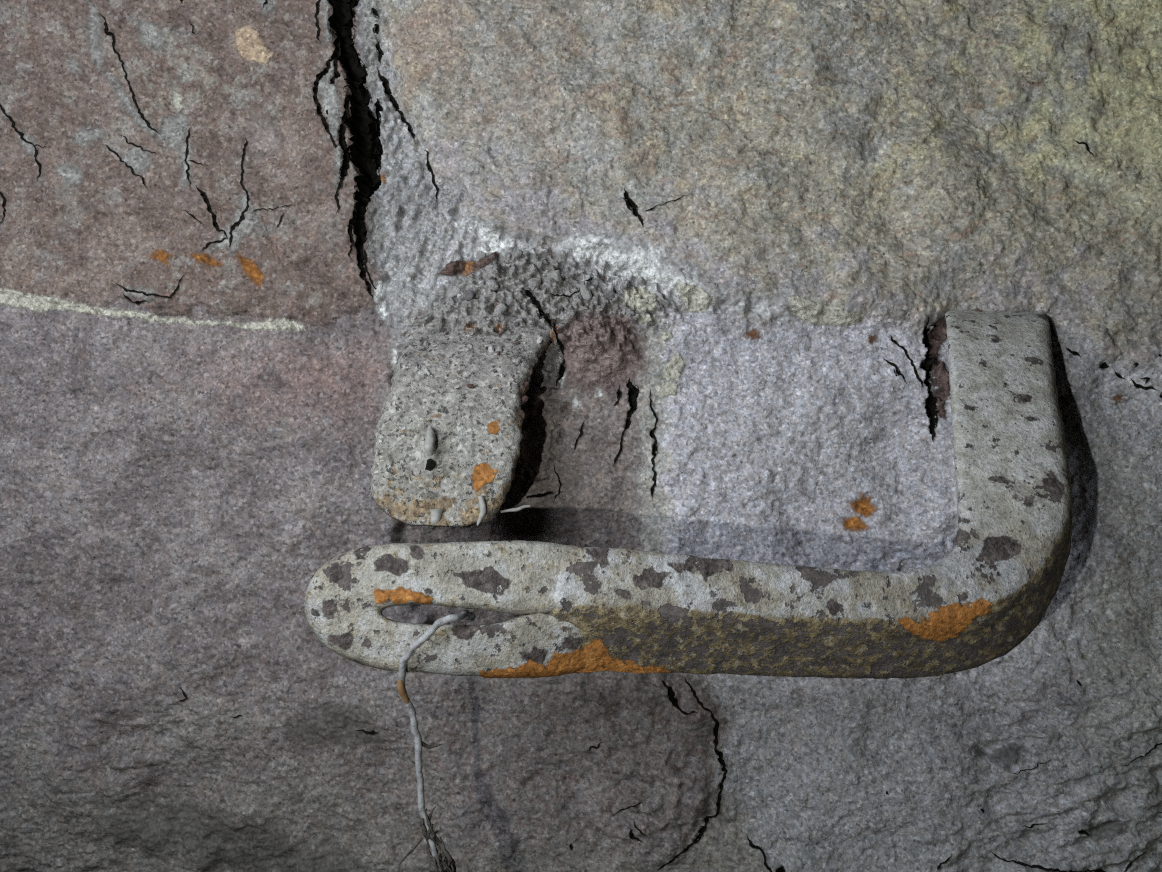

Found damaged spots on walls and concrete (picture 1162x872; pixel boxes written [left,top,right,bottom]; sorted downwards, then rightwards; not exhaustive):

crack [0,104,47,181]
crack [97,12,294,250]
crack [313,0,439,298]
crack [883,322,939,443]
crack [613,378,658,496]
rust [471,462,497,491]
rust [843,495,876,531]
rust [353,545,424,576]
rust [321,599,338,619]
rust [328,632,353,650]
rust [519,646,547,664]
crack [657,677,727,871]